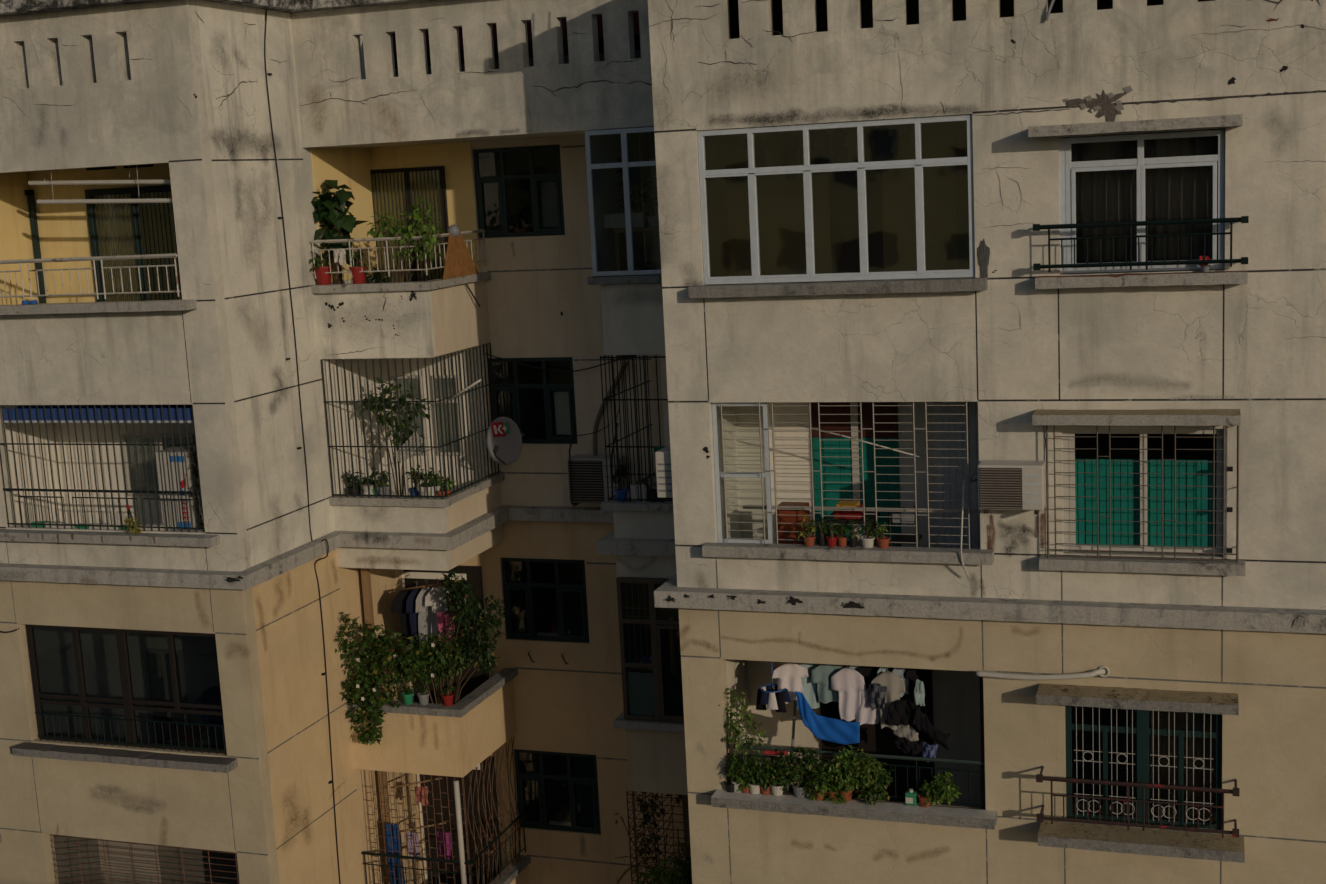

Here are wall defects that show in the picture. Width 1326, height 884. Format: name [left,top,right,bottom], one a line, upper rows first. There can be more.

crack [179,40,315,117]
crack [301,77,437,127]
crack [526,0,816,127]
crack [977,108,1067,116]
spalling [1063,86,1133,122]